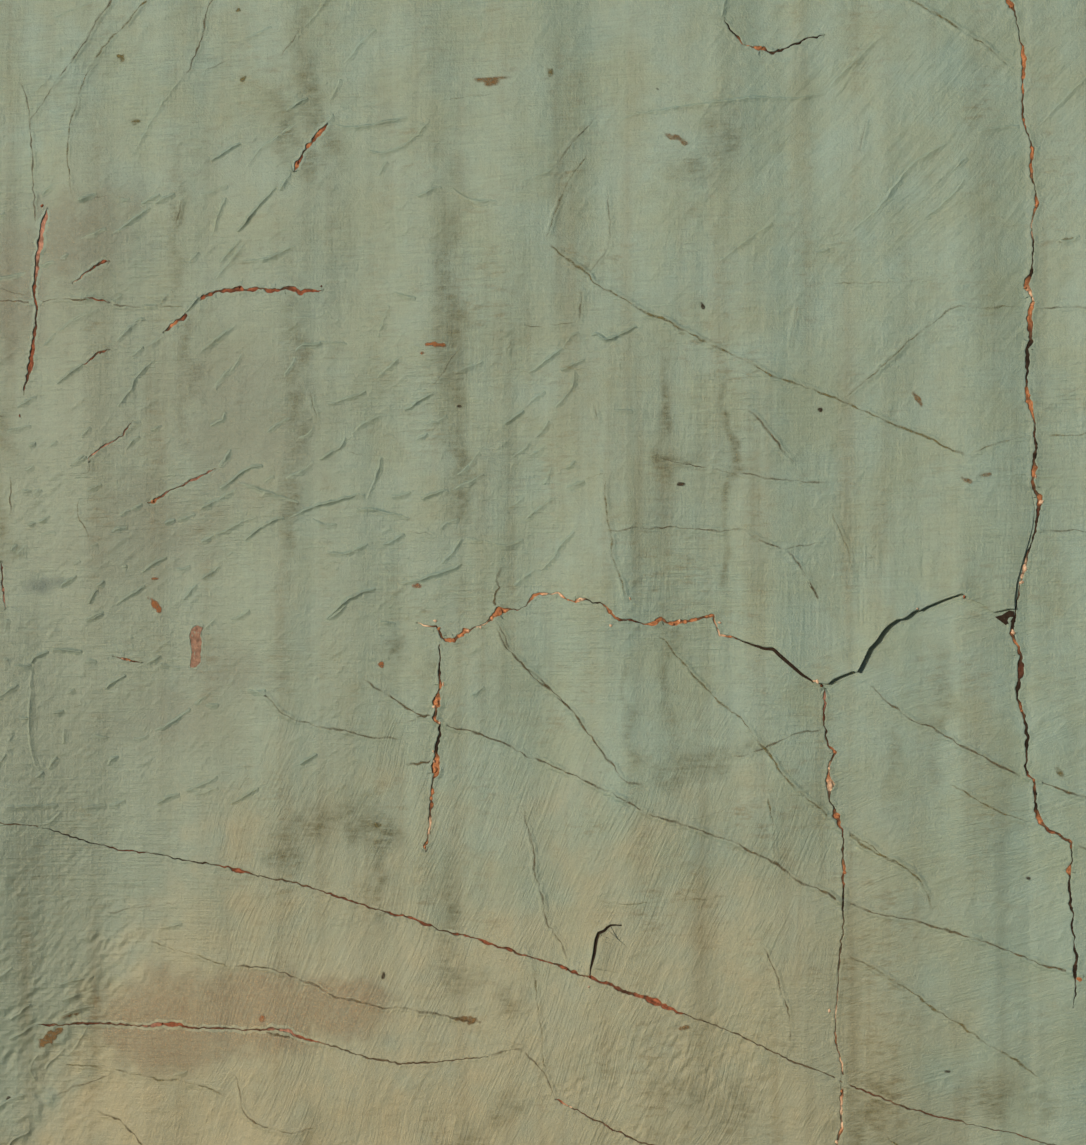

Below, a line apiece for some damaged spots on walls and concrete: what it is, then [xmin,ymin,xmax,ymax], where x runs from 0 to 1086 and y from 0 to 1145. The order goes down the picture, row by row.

crack [722,17,825,59]
crack [291,114,334,172]
crack [2,1,146,417]
crack [162,281,324,333]
crack [550,200,727,352]
crack [757,367,953,451]
crack [147,467,216,507]
crack [887,0,1084,1008]
crack [0,561,10,610]
peeling [188,622,205,671]
crack [370,583,792,852]
crack [0,688,1086,1145]